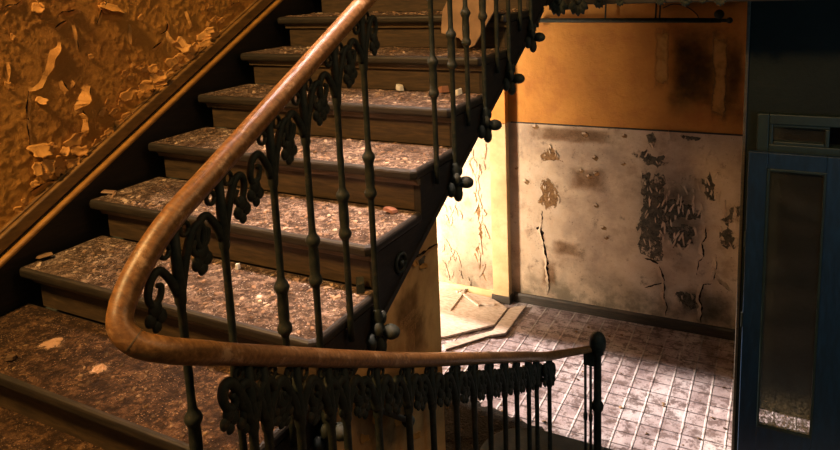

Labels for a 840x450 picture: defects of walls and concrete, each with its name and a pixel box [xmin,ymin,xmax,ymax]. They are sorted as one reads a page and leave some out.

peeling [31,0,45,16]
peeling [98,2,127,14]
peeling [26,4,225,189]
damp [679,39,740,115]
spalling [540,144,563,162]
spalling [538,178,560,210]
spalling [633,132,740,262]
crack [536,211,550,295]
crack [645,258,668,316]
crack [694,222,732,324]